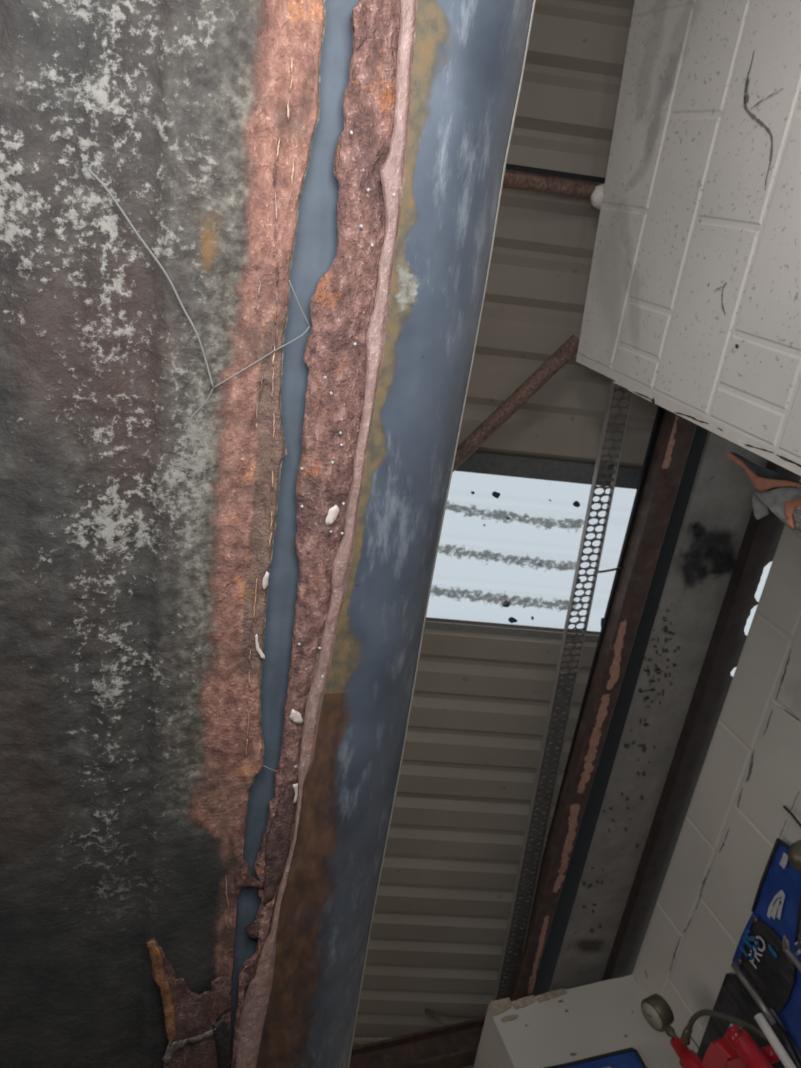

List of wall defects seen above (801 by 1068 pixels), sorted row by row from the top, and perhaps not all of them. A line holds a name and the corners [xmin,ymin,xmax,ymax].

corrosion [188,0,448,1068]
peeling [553,618,627,893]
mould [624,607,679,775]
mould [682,524,736,586]
crack [669,651,800,972]